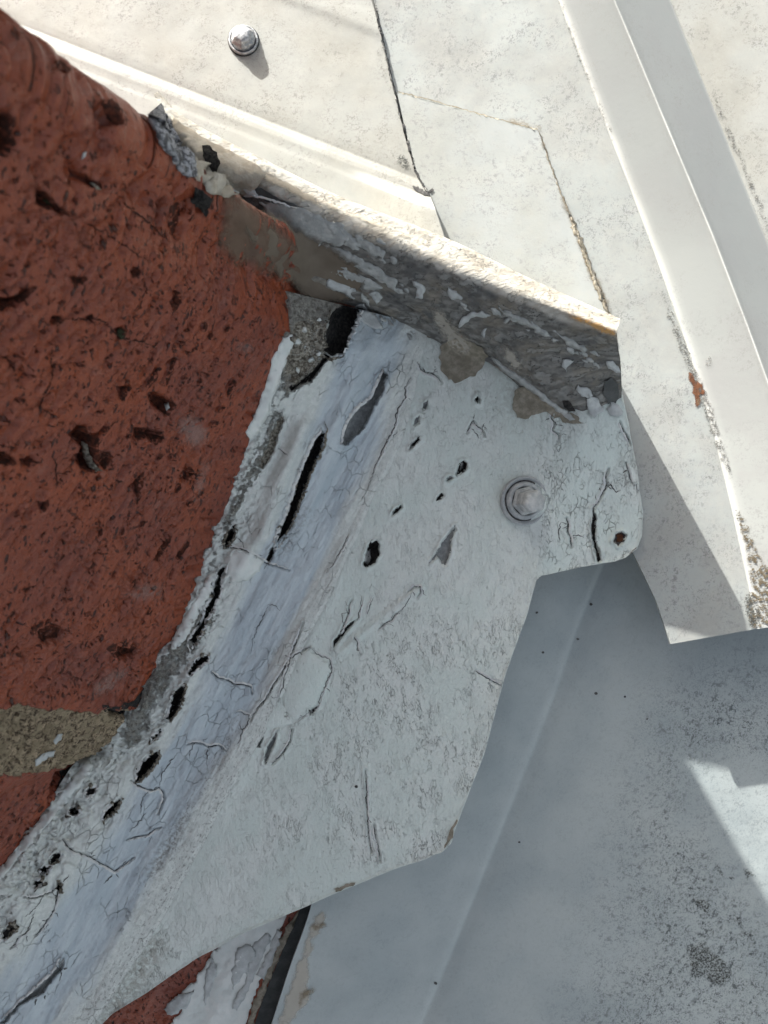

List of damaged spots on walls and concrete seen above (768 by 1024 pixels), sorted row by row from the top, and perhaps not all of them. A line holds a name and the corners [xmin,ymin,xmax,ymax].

peeling [259,202,426,329]
spalling [439,288,621,383]
crack [2,348,56,419]
crack [368,362,441,487]
crack [467,415,486,438]
spalling [512,385,623,424]
rust [688,372,705,407]
spalling [429,525,455,565]
crack [558,422,633,562]
spalling [614,531,626,546]
crack [12,584,425,949]
peeling [163,910,300,1024]